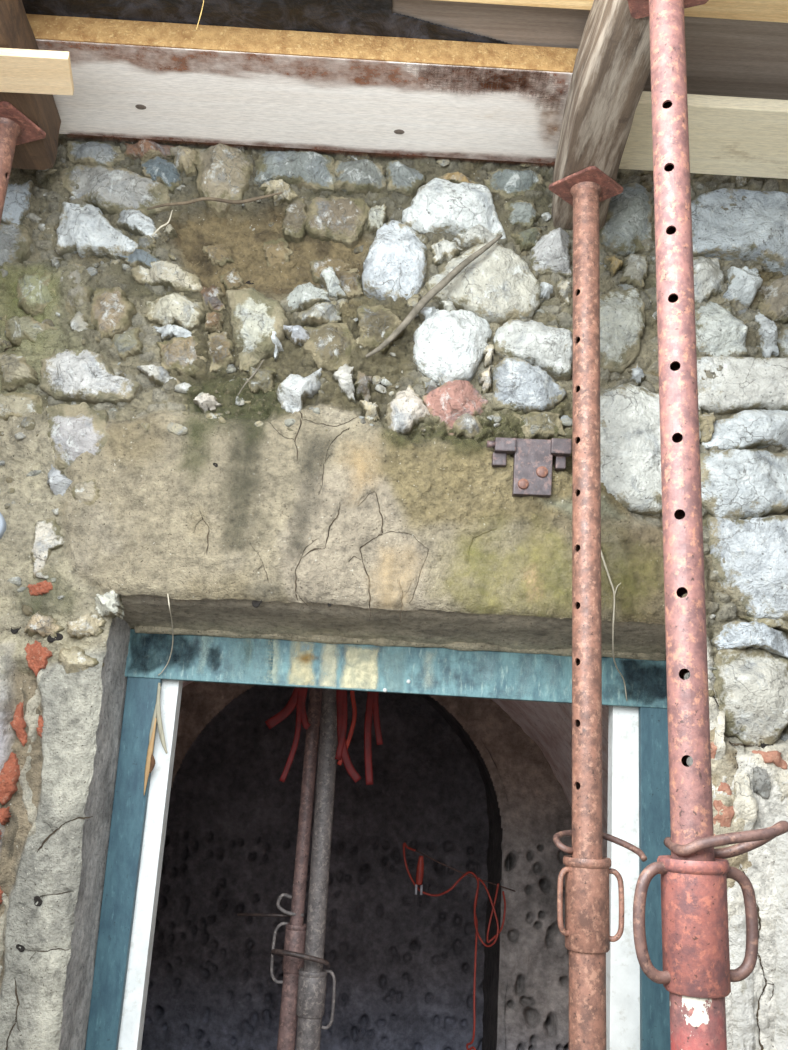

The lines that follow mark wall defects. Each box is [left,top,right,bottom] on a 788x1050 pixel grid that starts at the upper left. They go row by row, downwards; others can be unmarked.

crack [270,413,429,622]
flaking render [0,633,63,974]
crack [6,978,21,1050]
crack [740,867,774,1050]